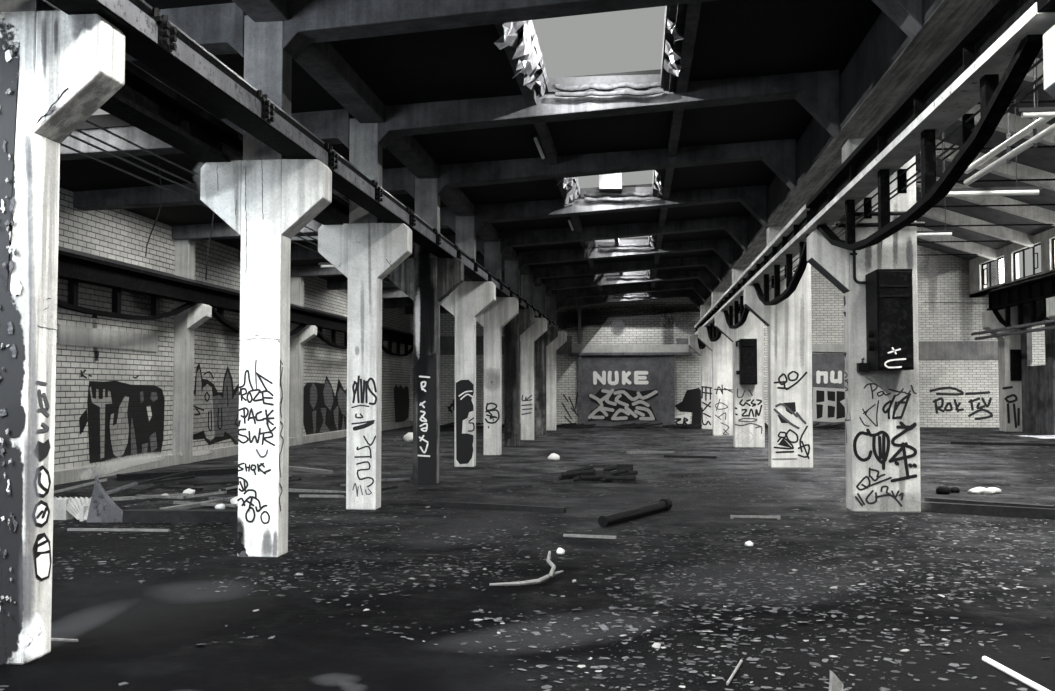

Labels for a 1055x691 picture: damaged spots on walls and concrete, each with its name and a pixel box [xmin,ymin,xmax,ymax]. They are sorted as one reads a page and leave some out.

peeling [0,12,44,665]
crack [37,88,68,125]